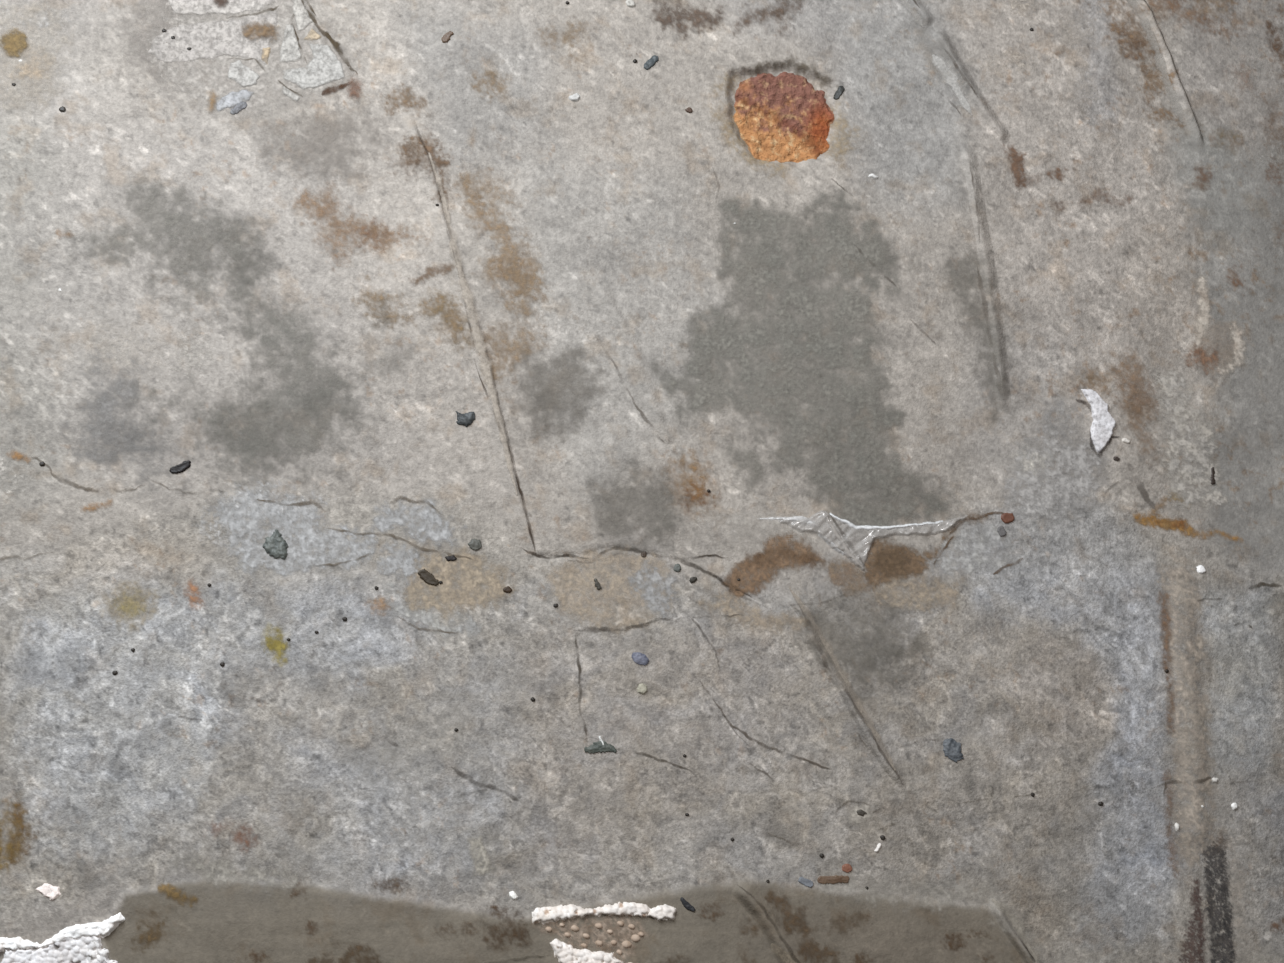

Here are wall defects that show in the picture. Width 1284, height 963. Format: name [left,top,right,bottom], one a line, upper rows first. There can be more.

damp [82,187,350,468]
damp [663,193,945,534]
crack [524,527,654,563]
crack [690,554,749,616]
corrosion [725,535,945,597]
crack [934,511,1003,563]
crack [1256,580,1278,588]
corrosion [765,891,836,962]